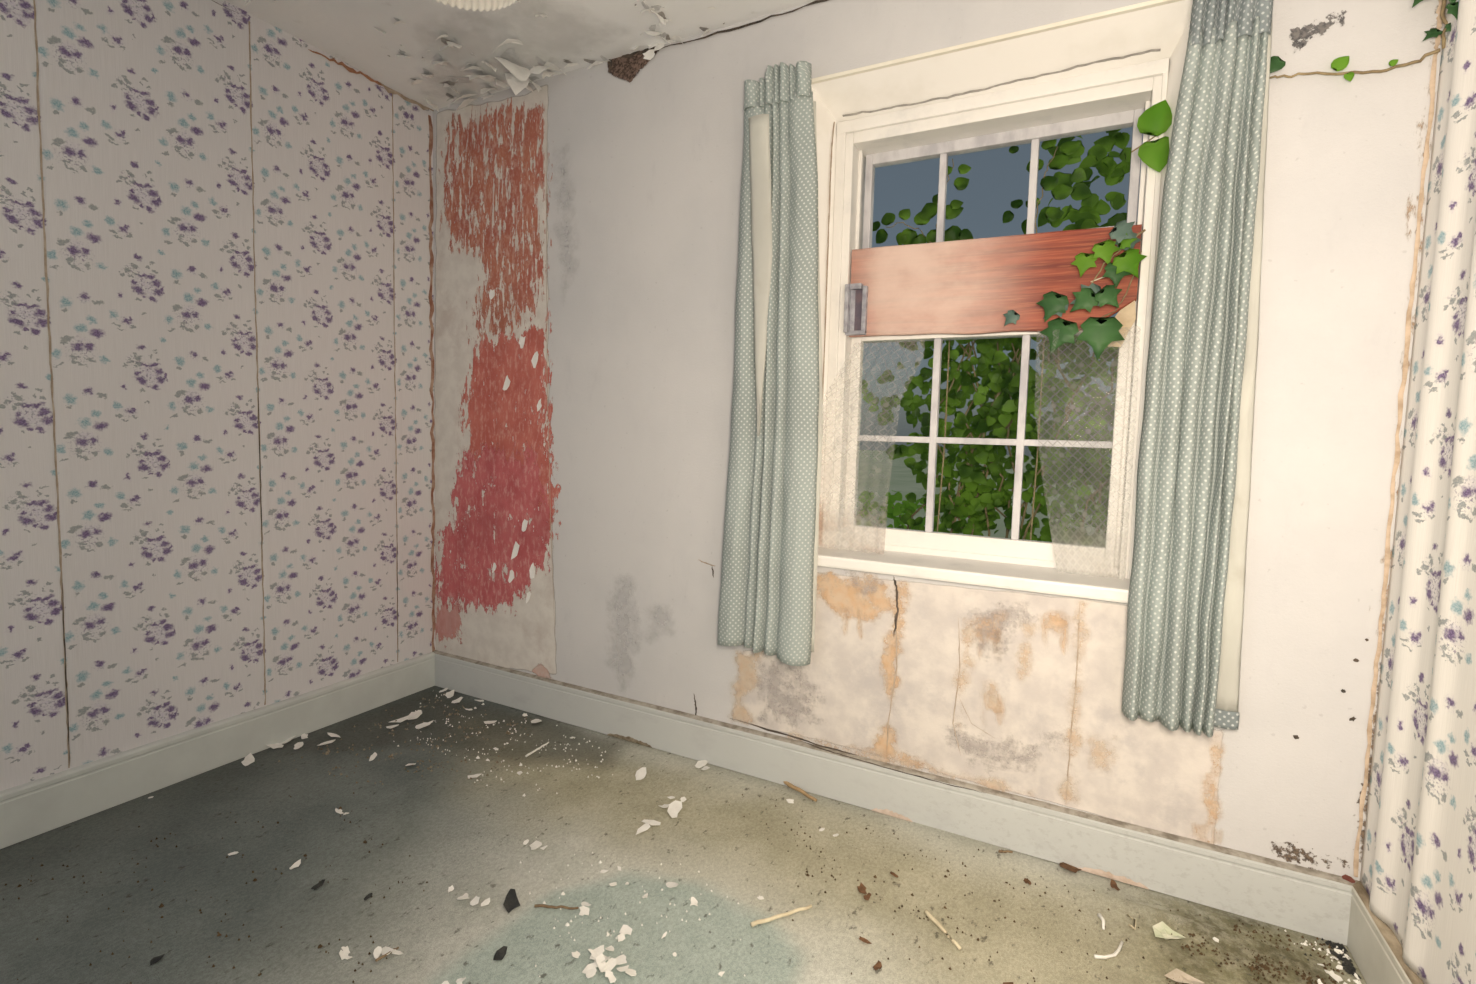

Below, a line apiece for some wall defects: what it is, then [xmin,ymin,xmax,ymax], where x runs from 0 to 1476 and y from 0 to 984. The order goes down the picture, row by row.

flaking render [387,0,683,678]
peeling [822,122,835,389]
flaking render [733,573,1223,844]
leakage [1271,712,1376,871]